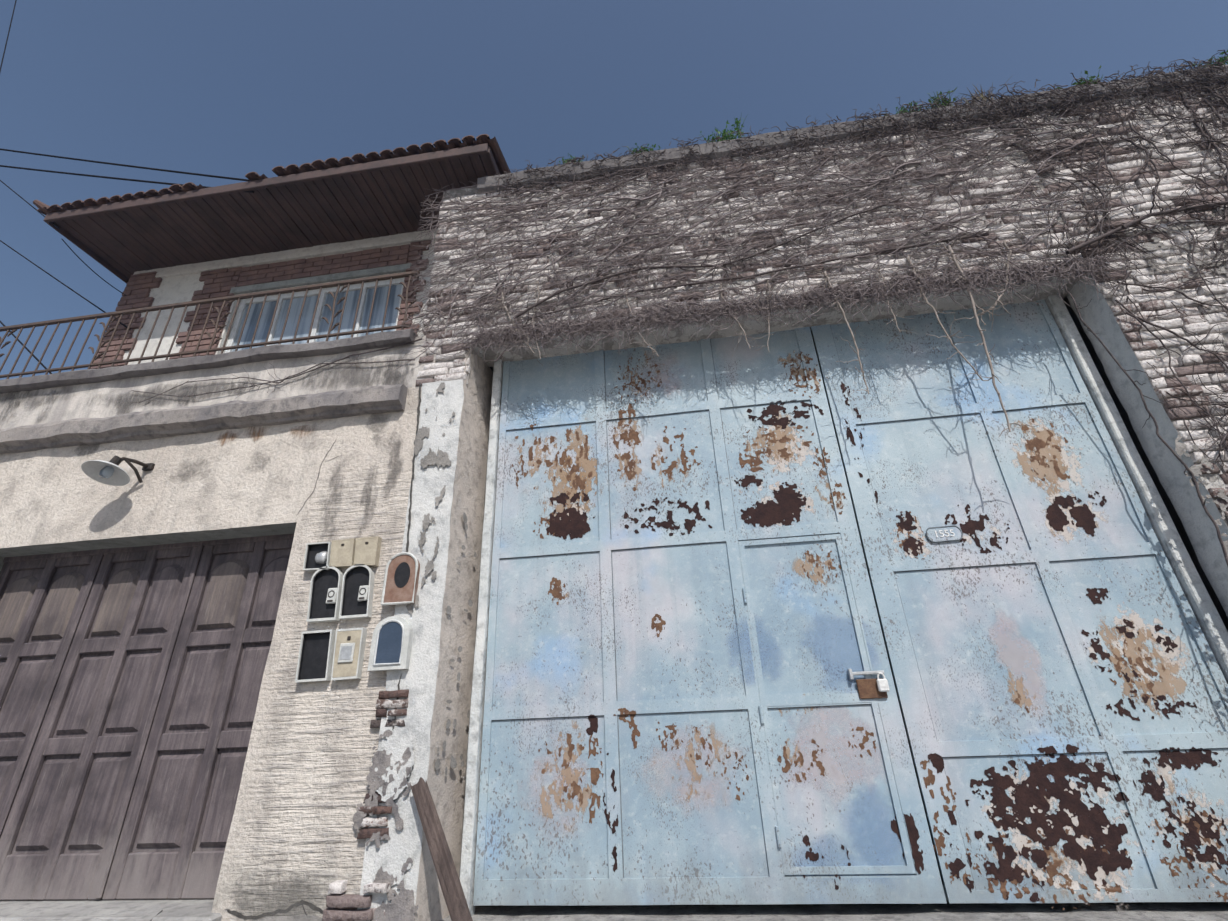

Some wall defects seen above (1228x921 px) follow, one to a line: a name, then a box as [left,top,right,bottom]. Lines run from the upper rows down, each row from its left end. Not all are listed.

rust [510,424,598,541]
rust [613,352,703,491]
rust [734,351,846,527]
rust [890,509,930,560]
rust [945,504,1010,554]
rust [1010,416,1107,543]
rust [1080,588,1197,721]
peeling [252,689,418,921]
peeling [435,710,470,780]
rust [538,714,603,827]
rust [653,722,753,801]
rust [920,744,1228,910]